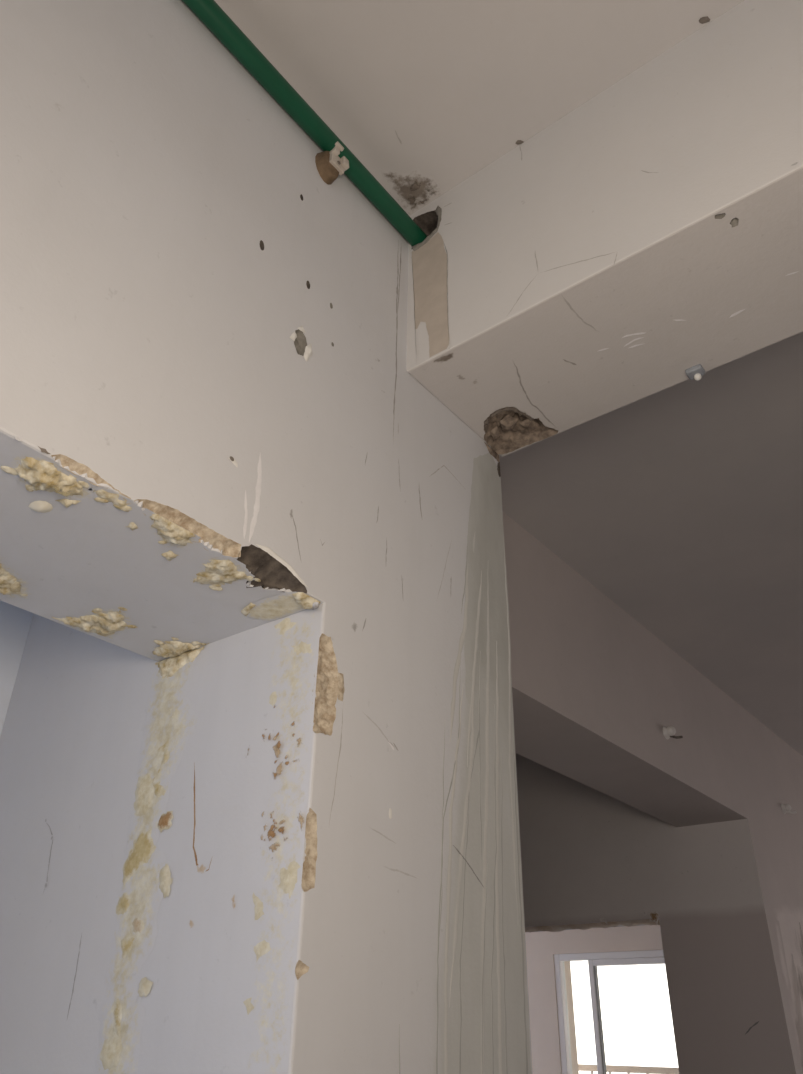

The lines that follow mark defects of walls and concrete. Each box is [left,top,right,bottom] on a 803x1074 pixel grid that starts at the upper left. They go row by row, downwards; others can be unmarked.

spalling [38,446,307,593]